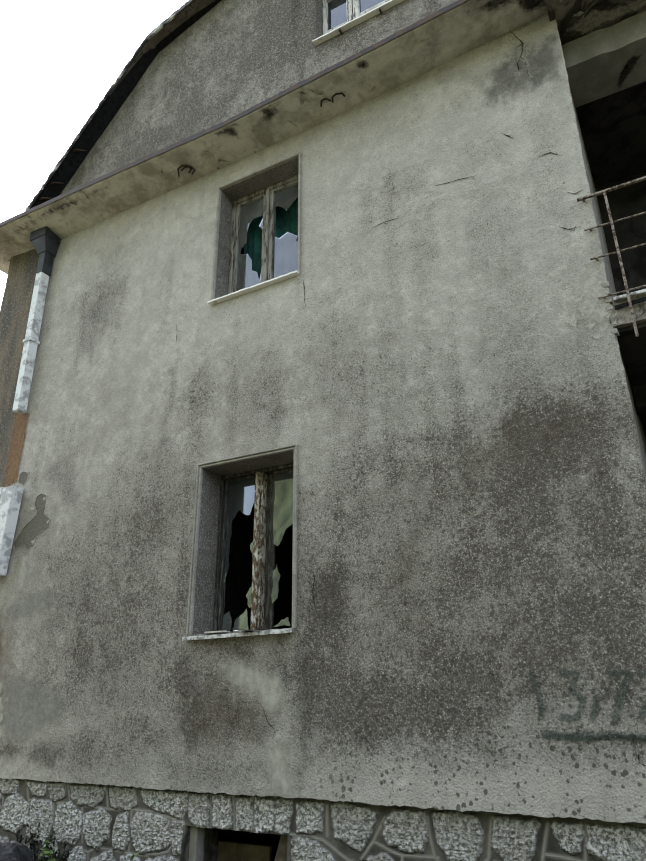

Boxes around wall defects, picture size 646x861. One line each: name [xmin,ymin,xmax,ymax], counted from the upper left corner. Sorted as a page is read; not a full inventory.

leakage [485,0,546,11]
spalling [13,492,51,589]